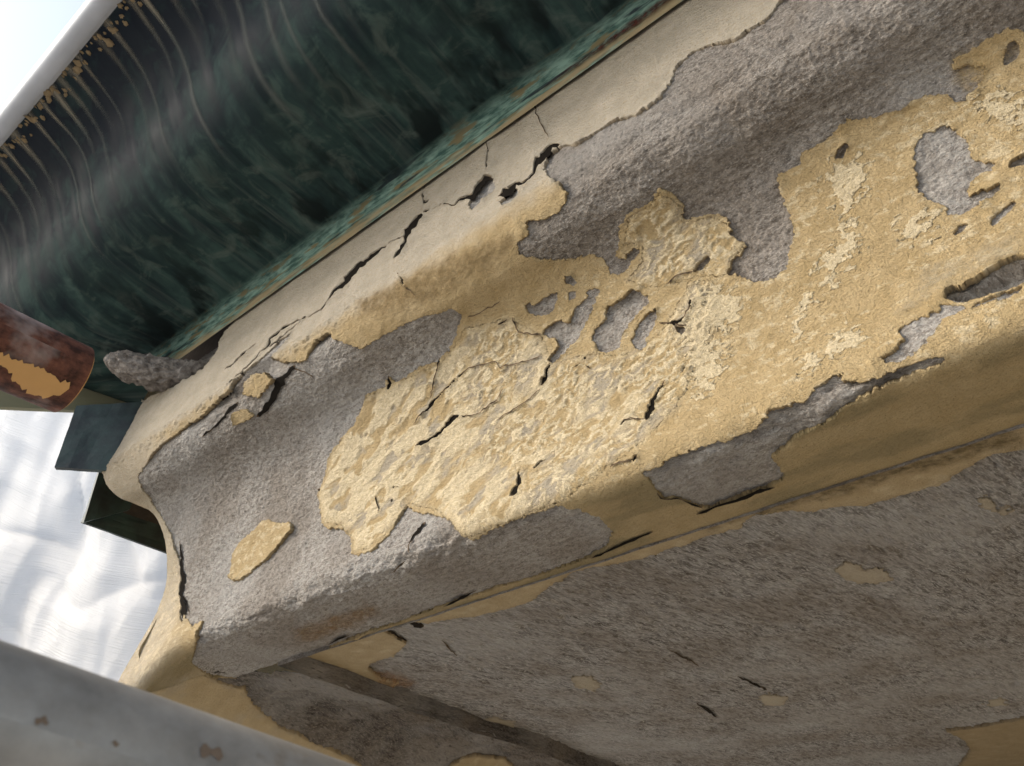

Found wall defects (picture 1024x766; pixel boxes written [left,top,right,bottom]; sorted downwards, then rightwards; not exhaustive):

damp [0,0,205,179]
crack [202,106,560,446]
spalling [470,177,495,209]
spalling [517,0,1024,401]
crack [179,544,190,621]
spalling [138,309,613,766]
crack [510,461,542,496]
crack [621,380,665,424]
spalling [643,260,1024,506]